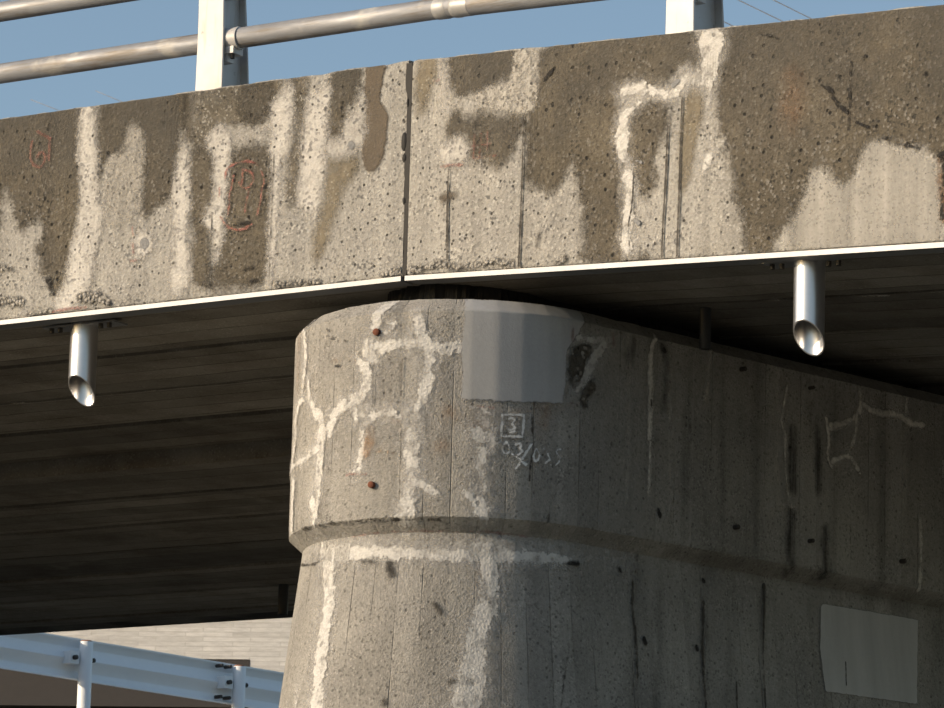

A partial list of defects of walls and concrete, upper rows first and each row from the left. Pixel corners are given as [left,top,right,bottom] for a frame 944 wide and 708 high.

leakage [0,65,388,312]
leakage [416,5,944,262]
spalling [568,334,613,408]
crack [290,300,638,708]
crack [700,600,708,708]